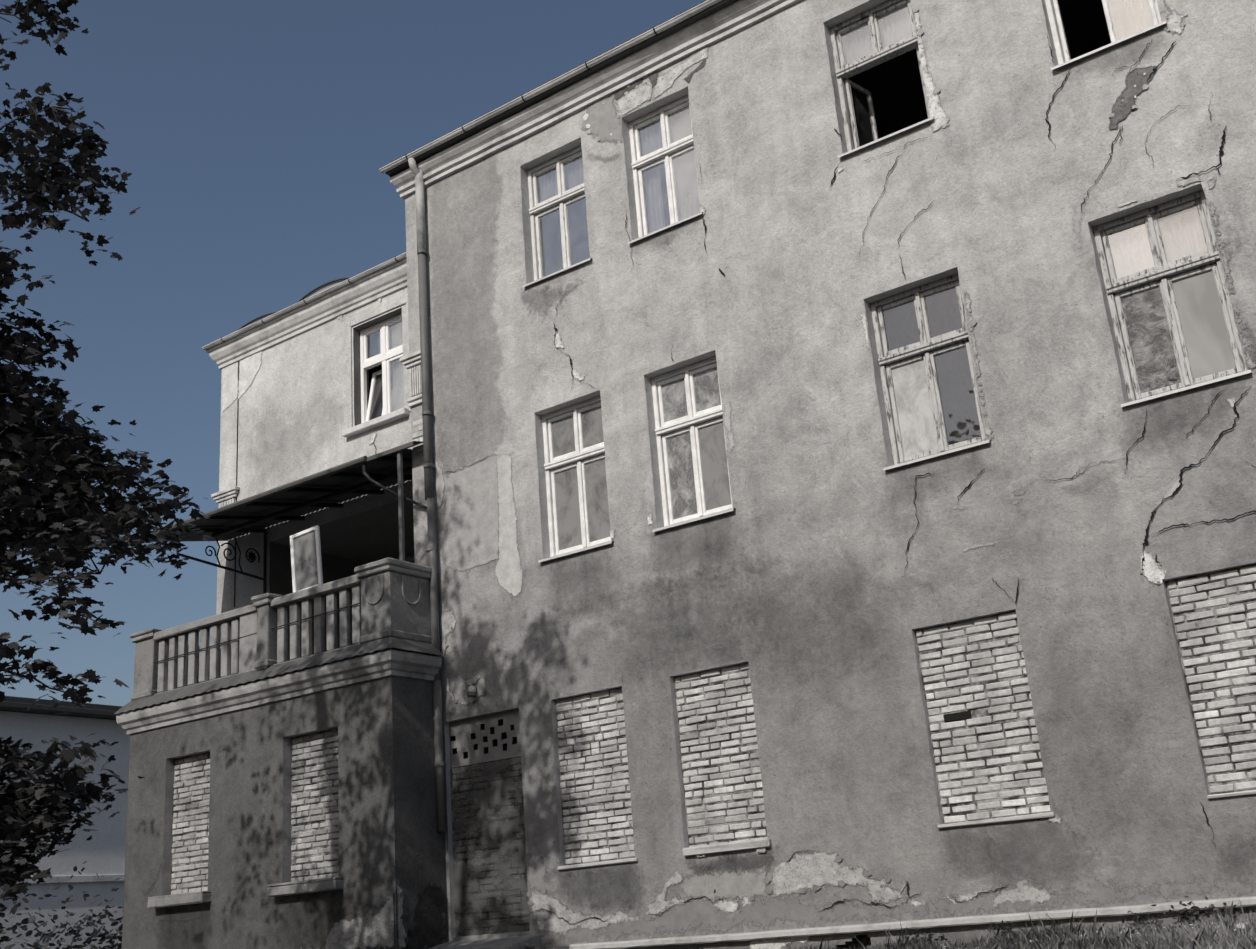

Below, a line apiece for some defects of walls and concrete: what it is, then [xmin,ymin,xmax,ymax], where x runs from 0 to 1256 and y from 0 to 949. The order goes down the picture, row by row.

flaking render [581,46,709,143]
flaking render [913,6,950,132]
crack [1045,35,1071,151]
flaking render [1108,65,1157,130]
crack [830,128,941,255]
crack [1081,102,1226,213]
crack [554,284,597,391]
crack [902,473,932,577]
crack [1142,387,1256,565]
flaking render [325,880,448,949]
flaking render [527,849,1256,949]